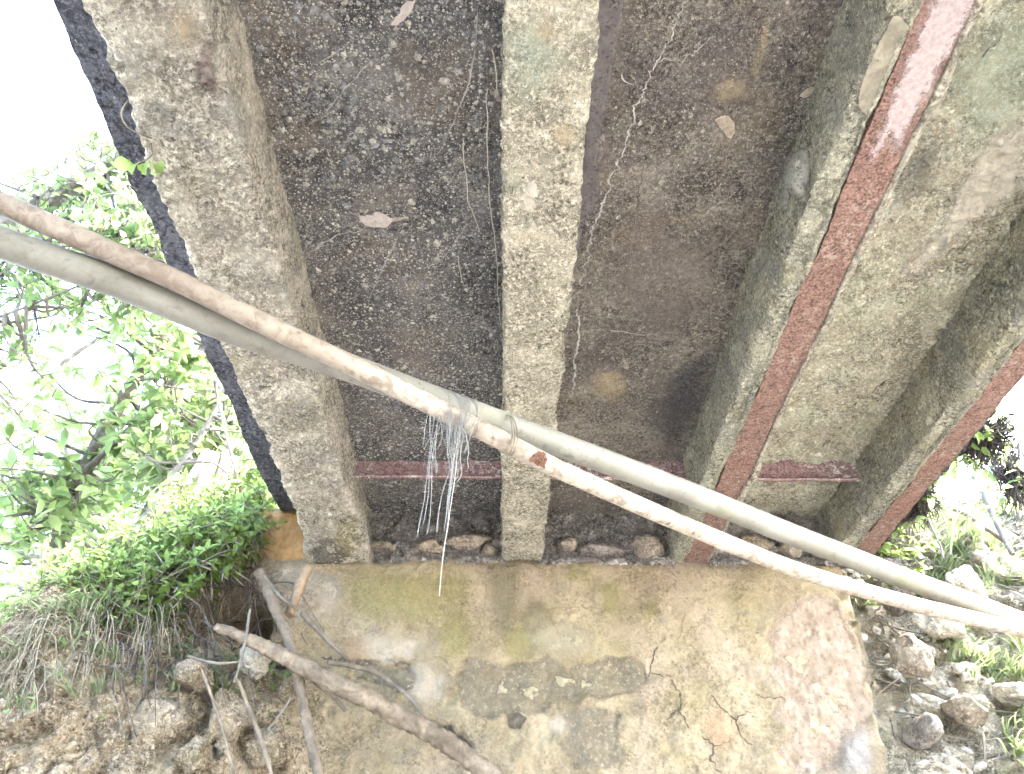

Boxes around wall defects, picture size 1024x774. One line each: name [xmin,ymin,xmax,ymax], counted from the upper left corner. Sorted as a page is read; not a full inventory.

crack [570,1,744,400]
spalling [455,656,648,768]
crack [646,611,785,773]